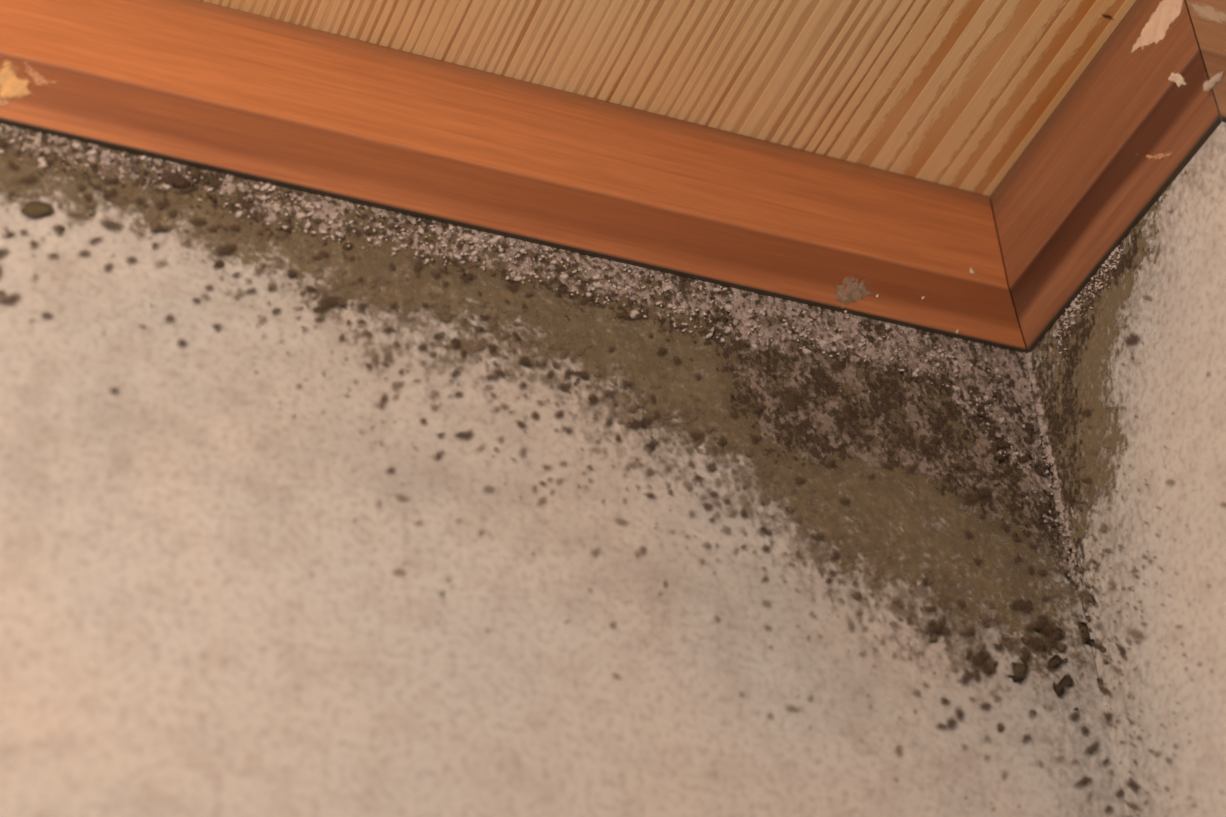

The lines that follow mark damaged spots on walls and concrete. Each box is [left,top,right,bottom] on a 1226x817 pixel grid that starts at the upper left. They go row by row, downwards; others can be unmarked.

water stain [0,124,1198,762]
water stain [1057,712,1196,817]